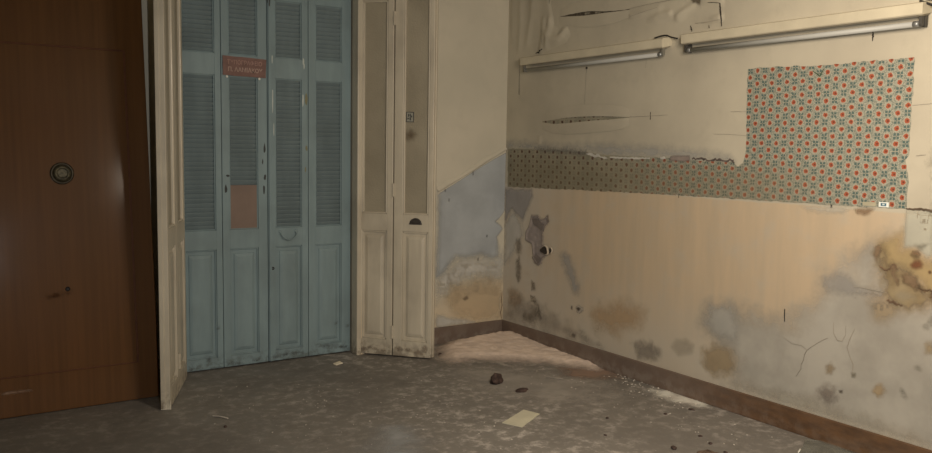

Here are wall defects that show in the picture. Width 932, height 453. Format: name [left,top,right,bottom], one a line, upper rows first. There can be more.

peeling [437,146,553,275]
water stain [873,238,932,316]